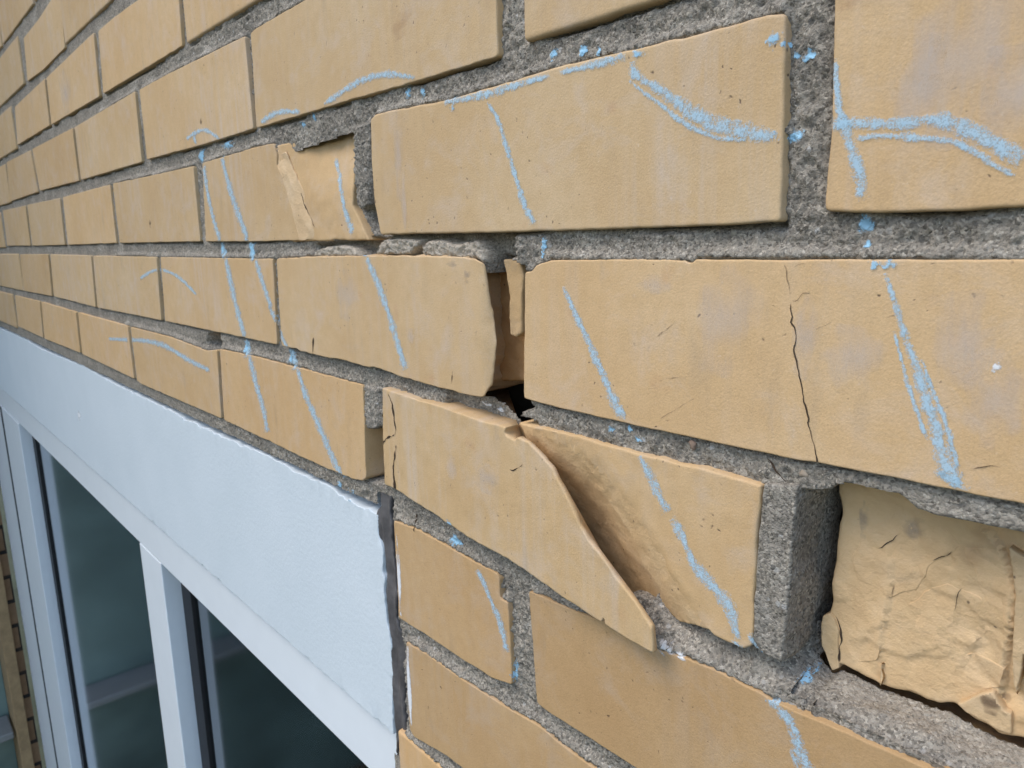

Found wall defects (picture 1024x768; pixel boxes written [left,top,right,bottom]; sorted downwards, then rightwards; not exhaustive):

spalling [277,132,385,242]
crack [383,394,396,489]
crack [786,270,818,462]
spalling [821,482,1024,737]